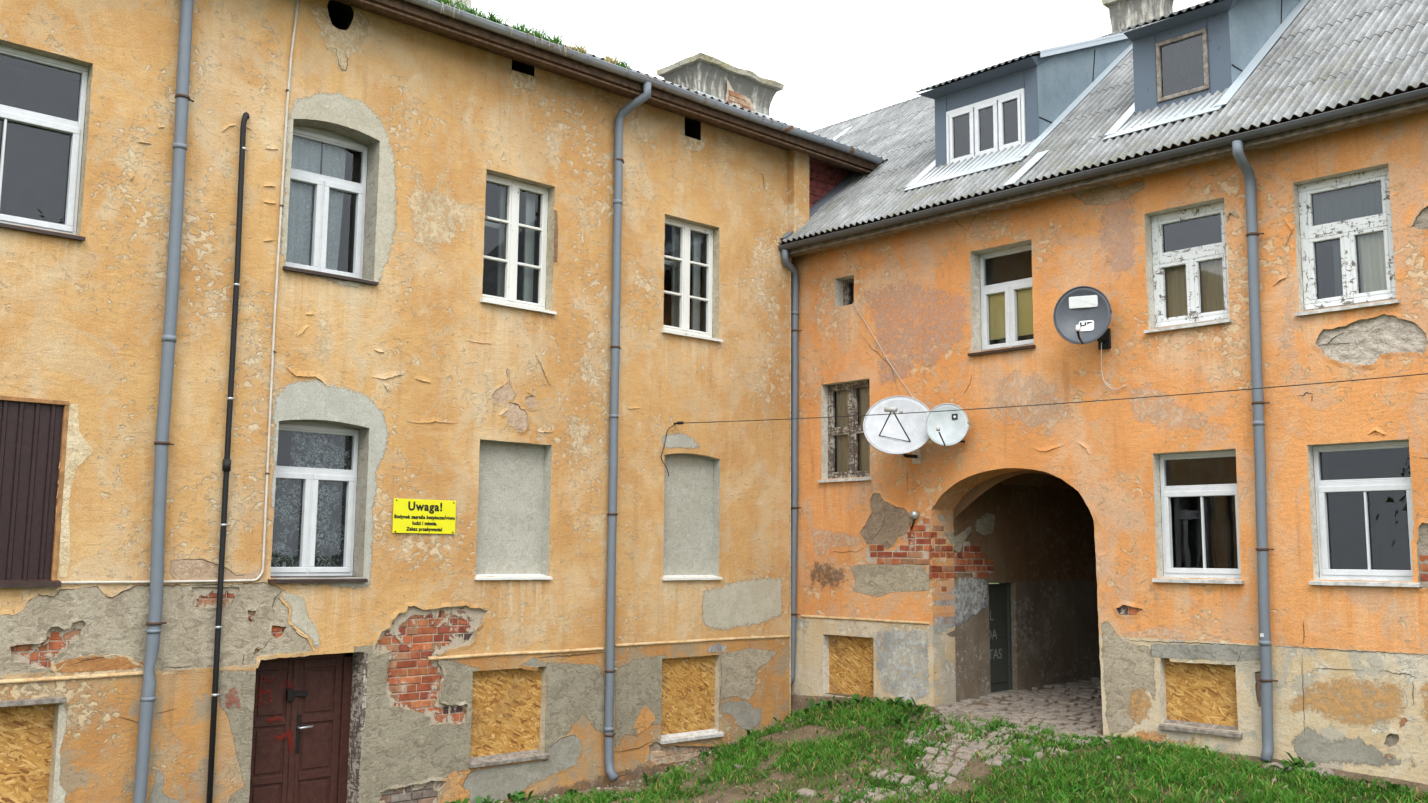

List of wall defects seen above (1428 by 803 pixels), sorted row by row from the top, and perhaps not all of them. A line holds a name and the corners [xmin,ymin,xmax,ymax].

flaking render [1406,201,1428,235]
flaking render [1311,309,1428,370]
flaking render [850,490,996,597]
flaking render [1411,518,1428,594]
flaking render [0,559,317,803]
flaking render [354,601,491,803]
flaking render [540,654,723,768]
flaking render [717,648,777,700]
flaking render [1101,600,1156,733]
flaking render [1250,666,1261,711]
flaking render [1378,728,1405,753]